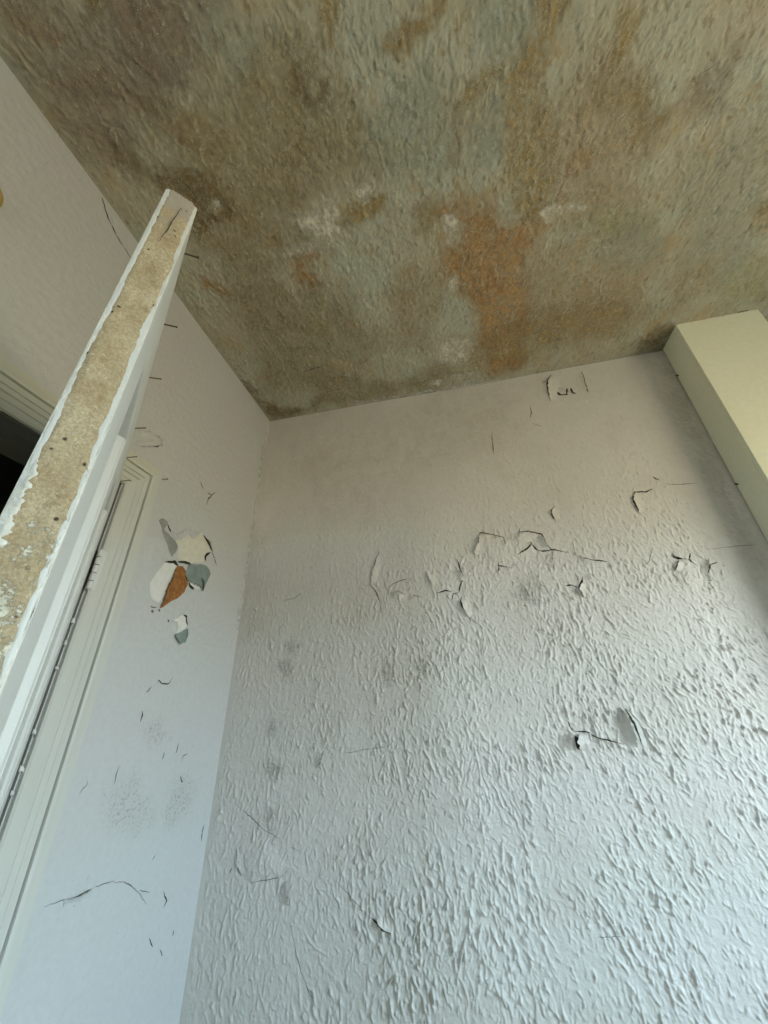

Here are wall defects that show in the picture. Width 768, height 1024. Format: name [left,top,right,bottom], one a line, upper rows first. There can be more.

water stain [0,0,197,181]
water stain [155,43,363,270]
water stain [457,0,569,217]
peeling [538,371,588,401]
flaking render [149,518,213,644]
peeling [558,708,647,752]
crack [45,881,167,907]